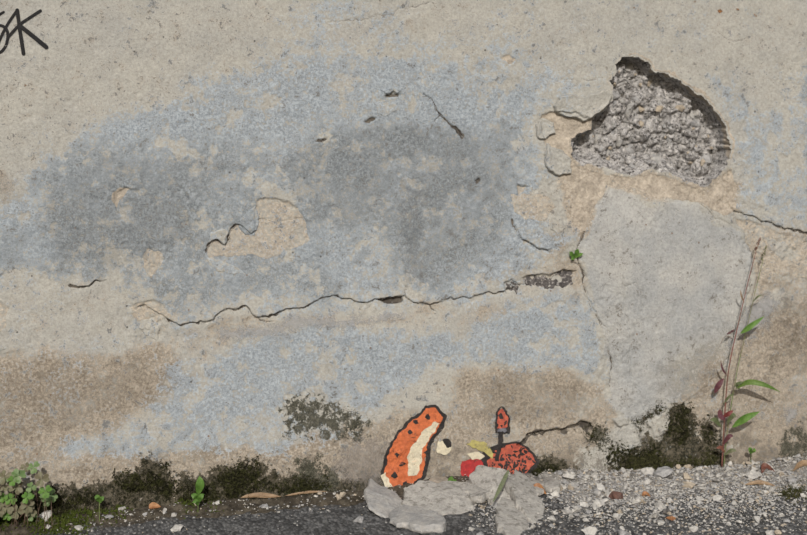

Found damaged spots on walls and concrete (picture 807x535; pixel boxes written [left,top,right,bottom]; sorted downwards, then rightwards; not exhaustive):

crack [426,96,464,139]
spalling [535,52,735,236]
spalling [207,198,316,275]
crack [701,204,807,234]
spalling [736,219,807,280]
crack [167,284,521,326]
spalling [506,270,573,294]
water stain [278,392,371,442]
crack [521,421,593,444]
water stain [608,404,730,471]
water stain [11,451,384,521]
water stain [535,454,580,472]